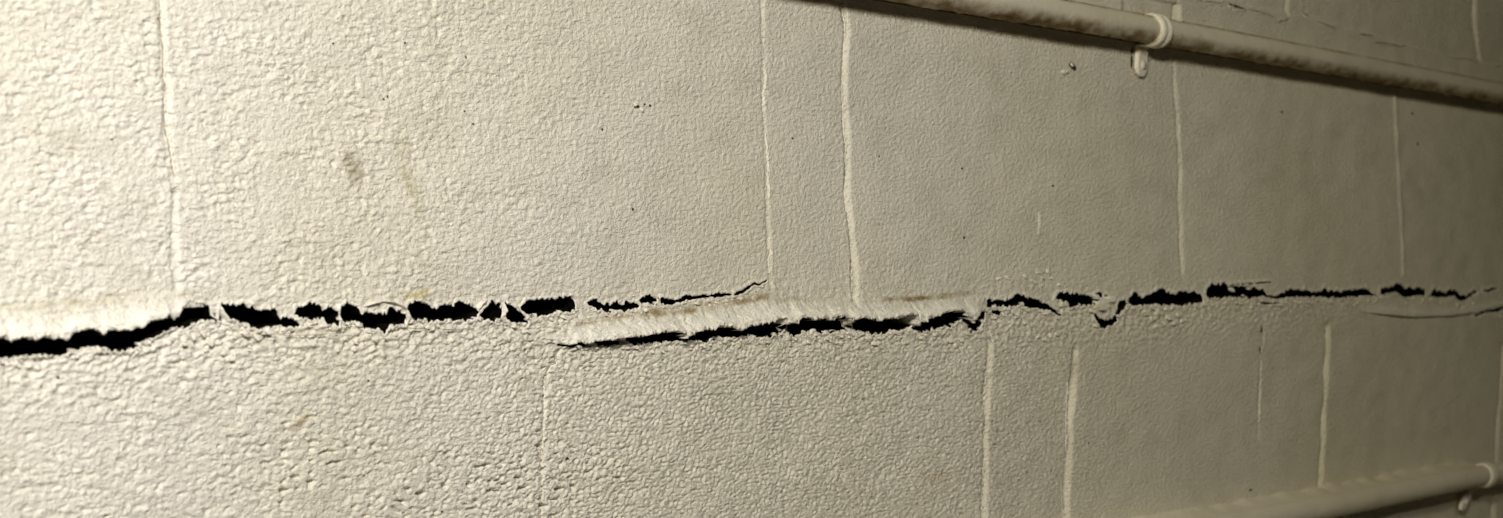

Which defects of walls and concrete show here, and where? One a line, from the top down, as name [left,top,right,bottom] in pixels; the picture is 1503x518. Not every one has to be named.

crack [157,0,180,192]
crack [761,60,771,199]
crack [840,7,852,292]
crack [0,248,1503,518]